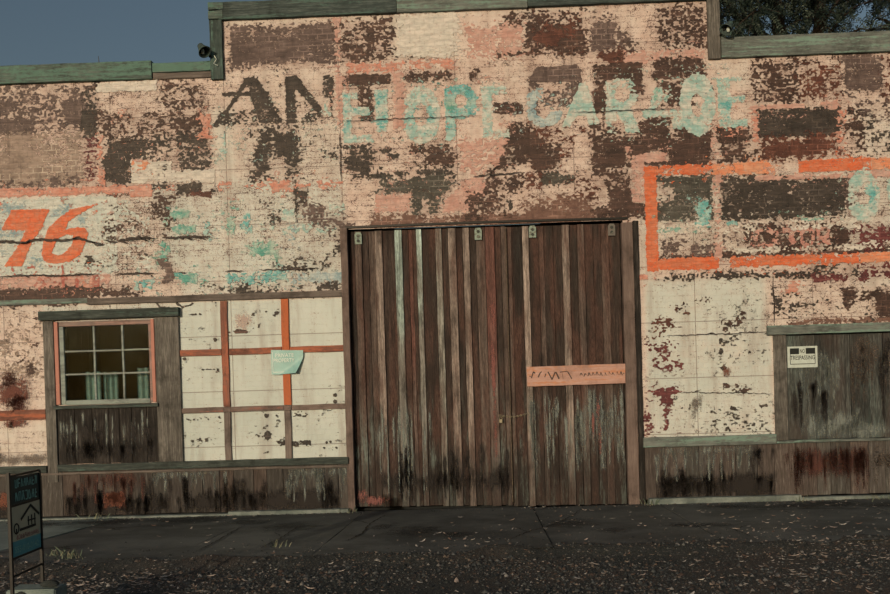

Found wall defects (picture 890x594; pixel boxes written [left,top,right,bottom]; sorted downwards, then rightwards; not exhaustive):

peeling [0,2,890,437]
corrosion [0,372,30,431]
leakage [43,468,347,531]
peeling [248,411,311,455]
leakage [379,406,512,499]
leakage [529,389,624,467]
leakage [654,446,851,508]
leakage [793,341,890,438]